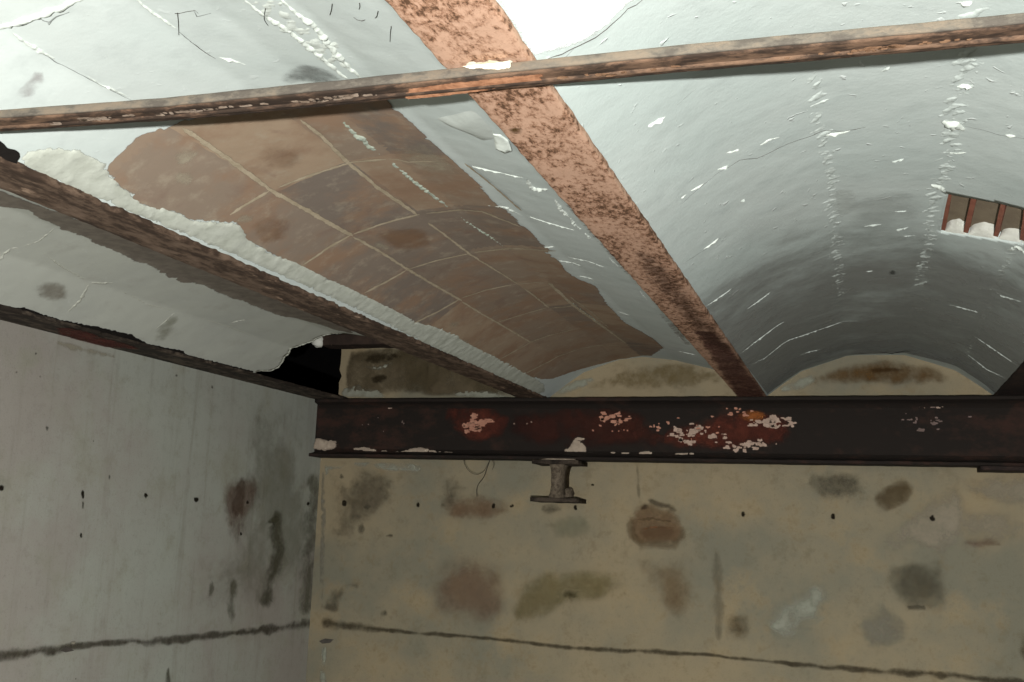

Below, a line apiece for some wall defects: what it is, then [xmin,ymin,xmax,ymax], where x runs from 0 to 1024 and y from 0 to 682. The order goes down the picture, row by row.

rust [406,74,543,99]
flaking render [108,93,663,379]
flaking render [0,191,500,399]
rust [639,253,762,397]
rust [450,409,786,447]
water stain [877,484,909,508]
water stain [261,512,284,605]